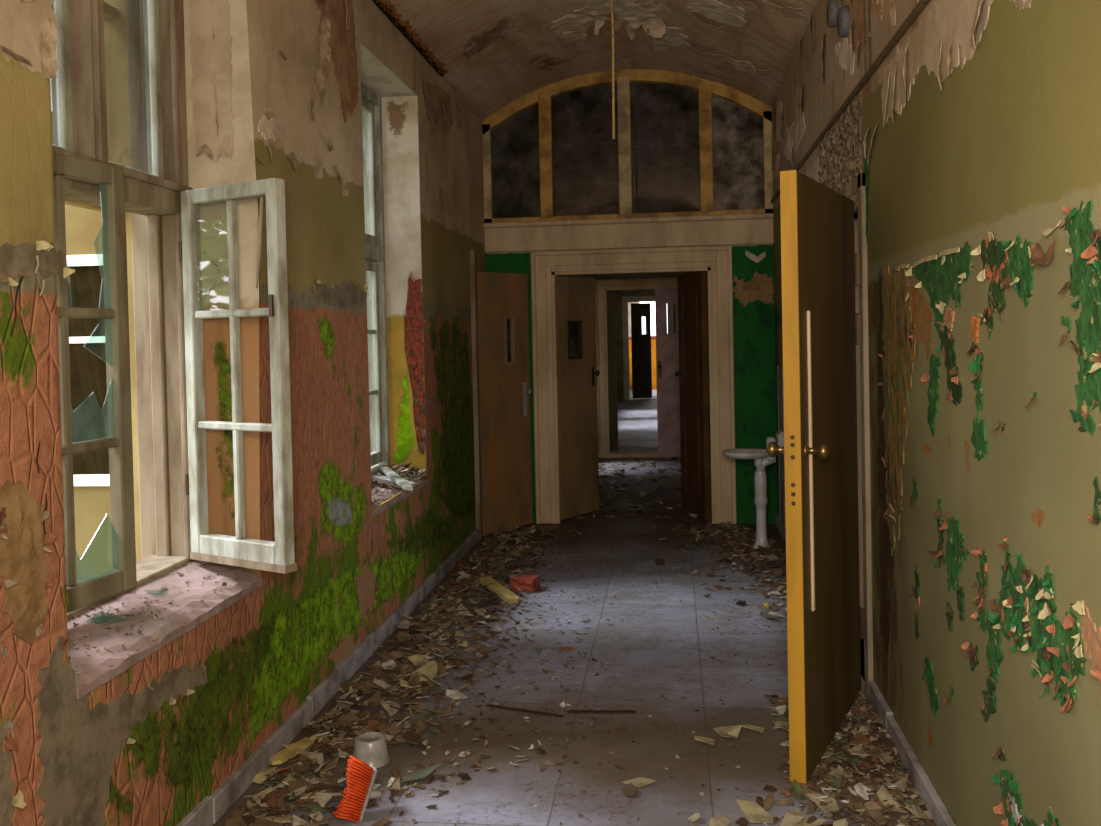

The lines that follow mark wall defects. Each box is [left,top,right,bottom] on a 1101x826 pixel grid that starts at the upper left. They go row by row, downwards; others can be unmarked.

peeling [550,0,774,78]
peeling [311,0,359,196]
peeling [799,0,993,241]
peeling [0,241,75,296]
spalling [400,271,428,455]
peeling [877,200,1101,556]
water stain [328,497,352,529]
peeling [908,565,920,640]
peeling [929,495,1101,722]
peeling [922,657,955,719]
peeling [991,746,1061,826]